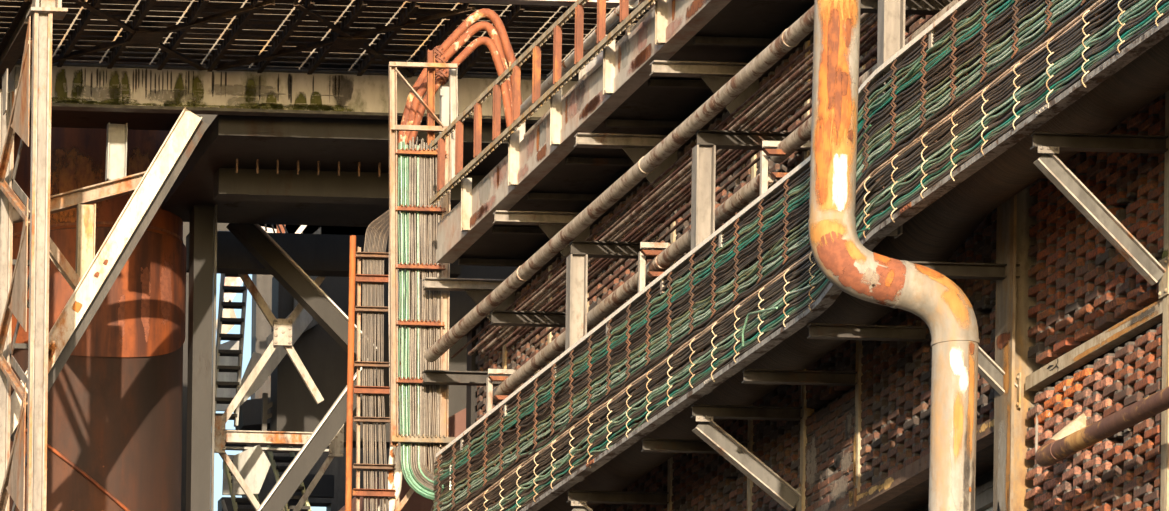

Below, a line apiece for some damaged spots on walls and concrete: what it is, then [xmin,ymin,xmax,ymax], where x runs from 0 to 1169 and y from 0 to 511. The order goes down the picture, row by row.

corrosion [618,21,652,73]
corrosion [128,148,151,176]
corrosion [517,123,547,181]
corrosion [810,0,973,323]
corrosion [28,12,104,511]
peeling [950,348,969,393]
peeling [950,429,963,510]